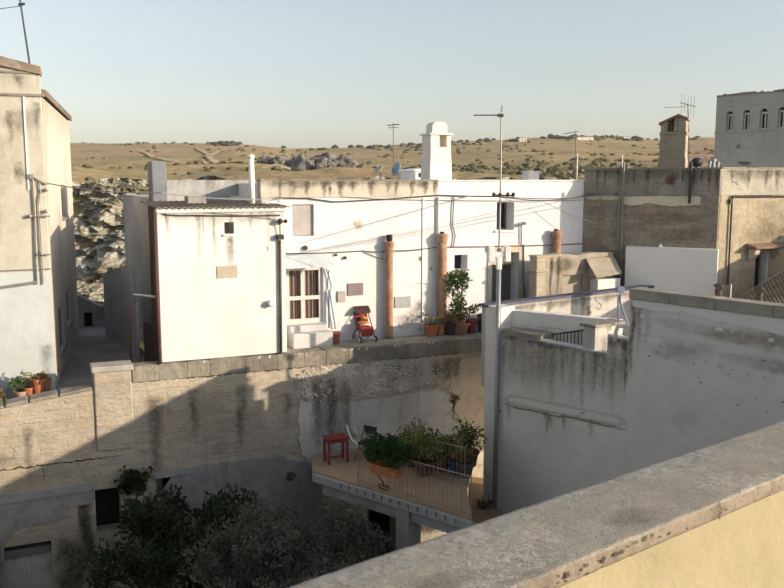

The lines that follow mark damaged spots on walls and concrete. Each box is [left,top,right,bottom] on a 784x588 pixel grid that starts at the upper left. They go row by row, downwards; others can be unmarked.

water stain [594,306,640,384]
flaking render [293,347,449,403]
crack [0,455,122,483]